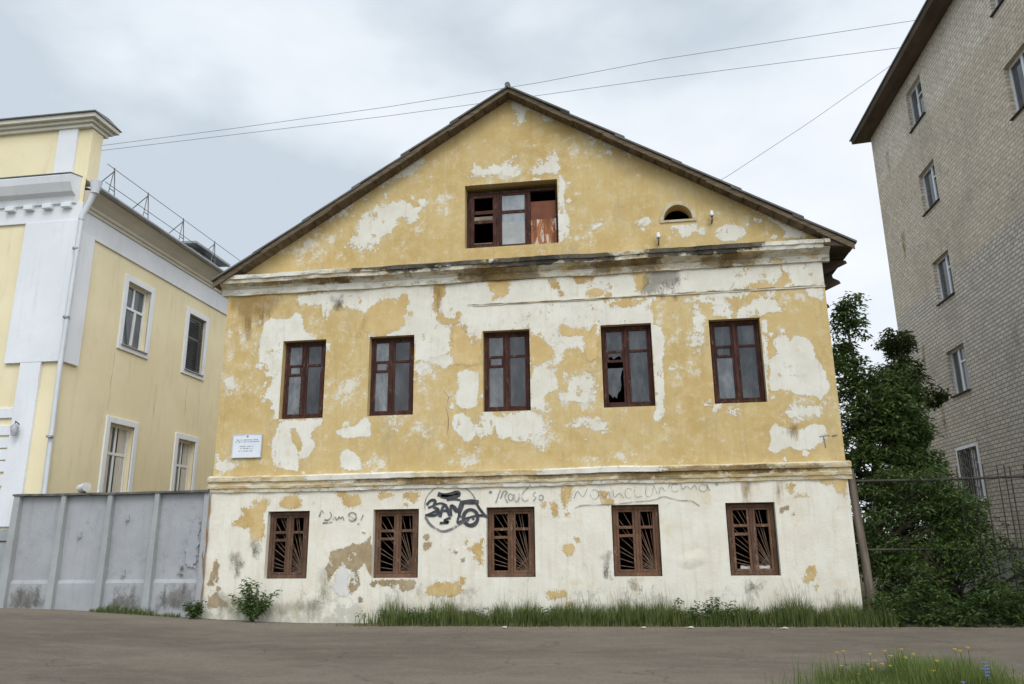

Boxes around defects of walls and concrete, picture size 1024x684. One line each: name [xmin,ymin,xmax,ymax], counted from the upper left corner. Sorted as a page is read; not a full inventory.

peeling [321,159,427,253]
peeling [469,150,572,243]
rust [531,218,557,244]
water stain [273,277,349,285]
water stain [369,262,446,278]
water stain [459,254,560,283]
water stain [570,257,661,274]
peeling [230,206,831,544]
spalling [324,532,466,603]